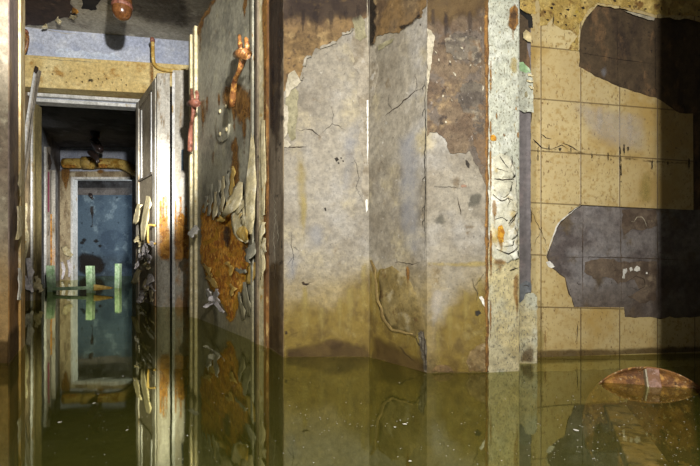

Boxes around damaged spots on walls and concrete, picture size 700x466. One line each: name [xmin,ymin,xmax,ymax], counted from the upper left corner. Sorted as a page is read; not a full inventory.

peeling [131,196,156,304]
corrosion [160,197,189,260]
peeling [188,120,267,322]
corrosion [218,83,251,185]
damp [270,0,376,150]
damp [269,264,427,373]
peeling [277,0,487,184]
crack [385,76,461,230]
damp [439,289,487,373]
corrosion [484,0,505,372]
peeling [519,0,700,115]
peeling [546,205,700,319]